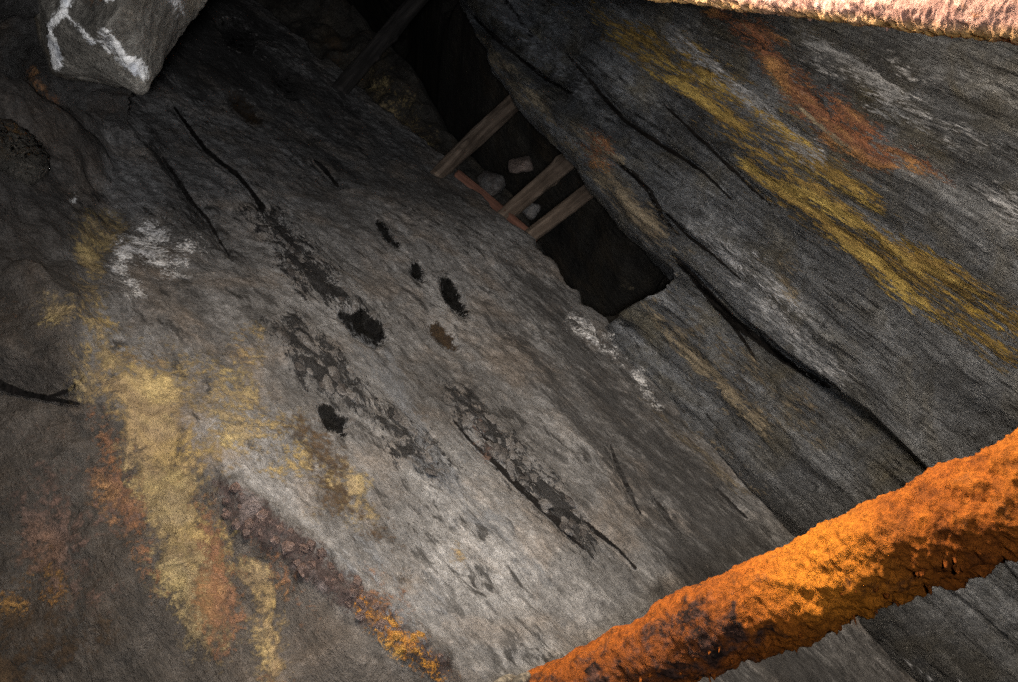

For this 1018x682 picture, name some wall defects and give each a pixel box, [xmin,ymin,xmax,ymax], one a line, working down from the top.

rust [647,0,1018,183]
crack [162,156,229,256]
crack [173,106,266,211]
crack [314,159,339,188]
crack [0,375,85,405]
rust [277,415,364,519]
crack [453,419,637,569]
rust [191,502,247,660]
rust [354,569,446,682]
rust [527,428,1018,682]